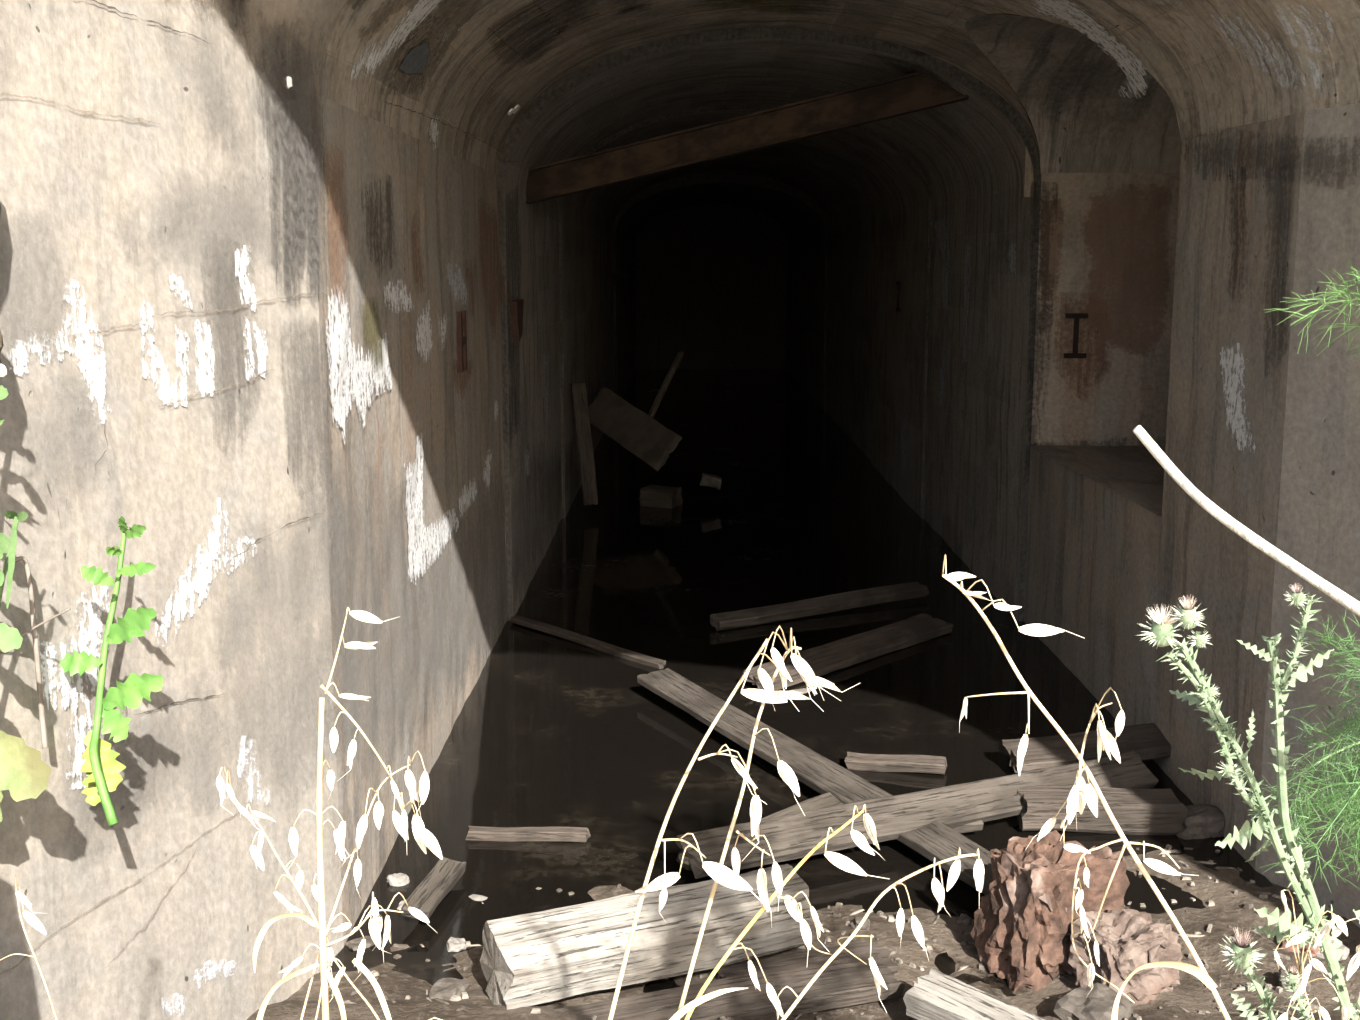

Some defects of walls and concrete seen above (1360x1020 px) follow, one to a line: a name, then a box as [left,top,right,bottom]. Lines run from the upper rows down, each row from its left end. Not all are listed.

crack [91,0,211,44]
damp [258,20,392,494]
damp [382,263,470,362]
crack [134,693,225,715]